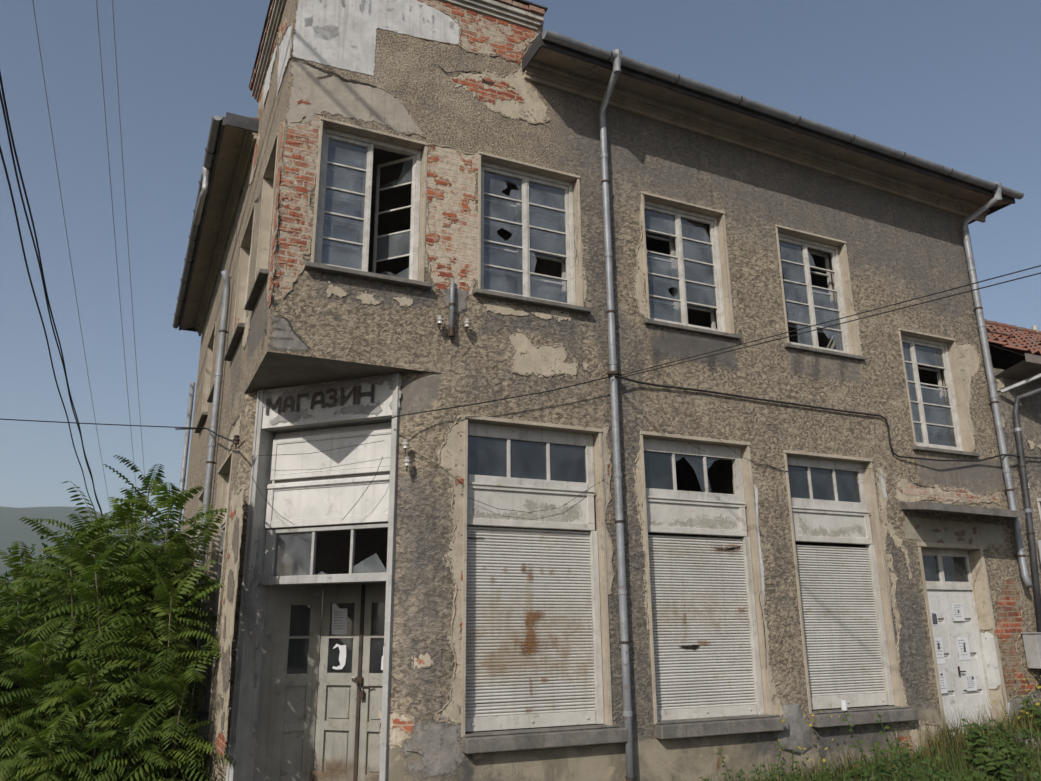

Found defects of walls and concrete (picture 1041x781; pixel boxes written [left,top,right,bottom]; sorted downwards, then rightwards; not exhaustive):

peeling [258,0,550,314]
flaking render [484,301,591,380]